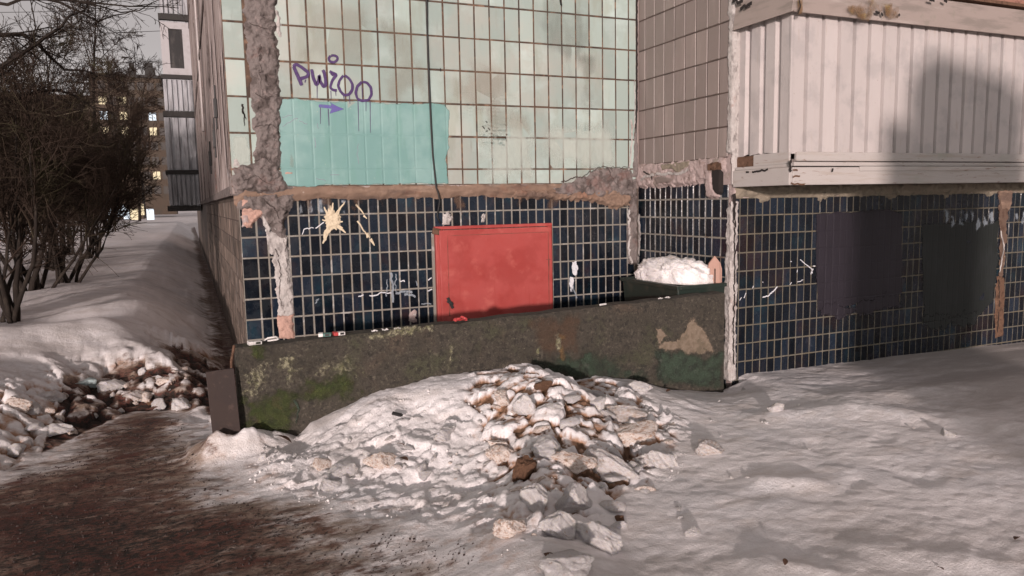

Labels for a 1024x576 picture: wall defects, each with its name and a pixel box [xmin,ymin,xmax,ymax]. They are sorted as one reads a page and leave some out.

peeling [237,194,295,339]
peeling [510,0,1024,382]